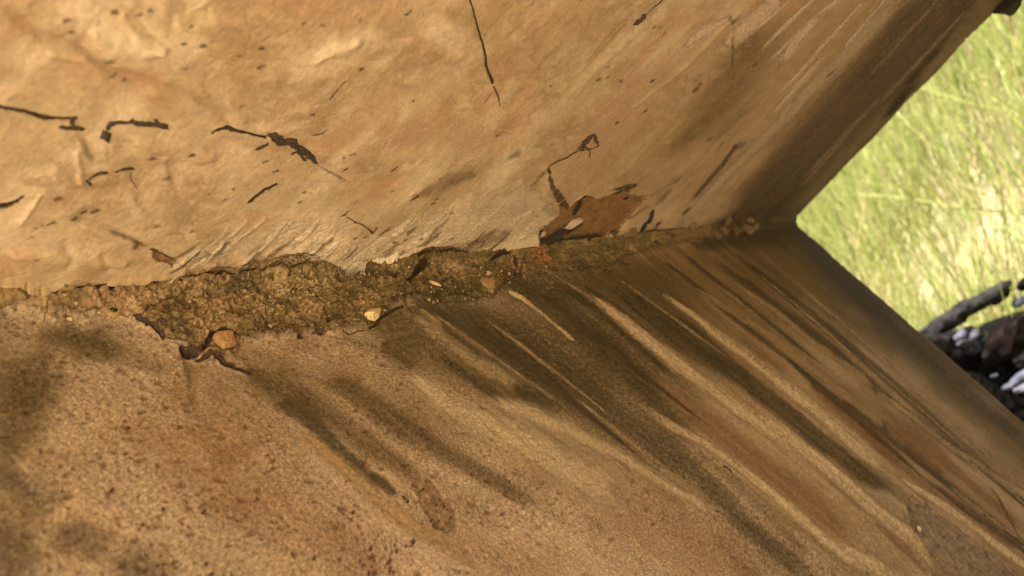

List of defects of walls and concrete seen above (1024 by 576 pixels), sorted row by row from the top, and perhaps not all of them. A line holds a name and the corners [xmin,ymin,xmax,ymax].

crack [470,0,500,106]
crack [0,105,168,143]
crack [212,125,341,178]
crack [547,134,600,209]
crack [132,240,251,375]
spalling [0,188,776,358]
leakage [247,367,464,558]
leakage [336,380,523,497]
leakage [382,256,1024,576]